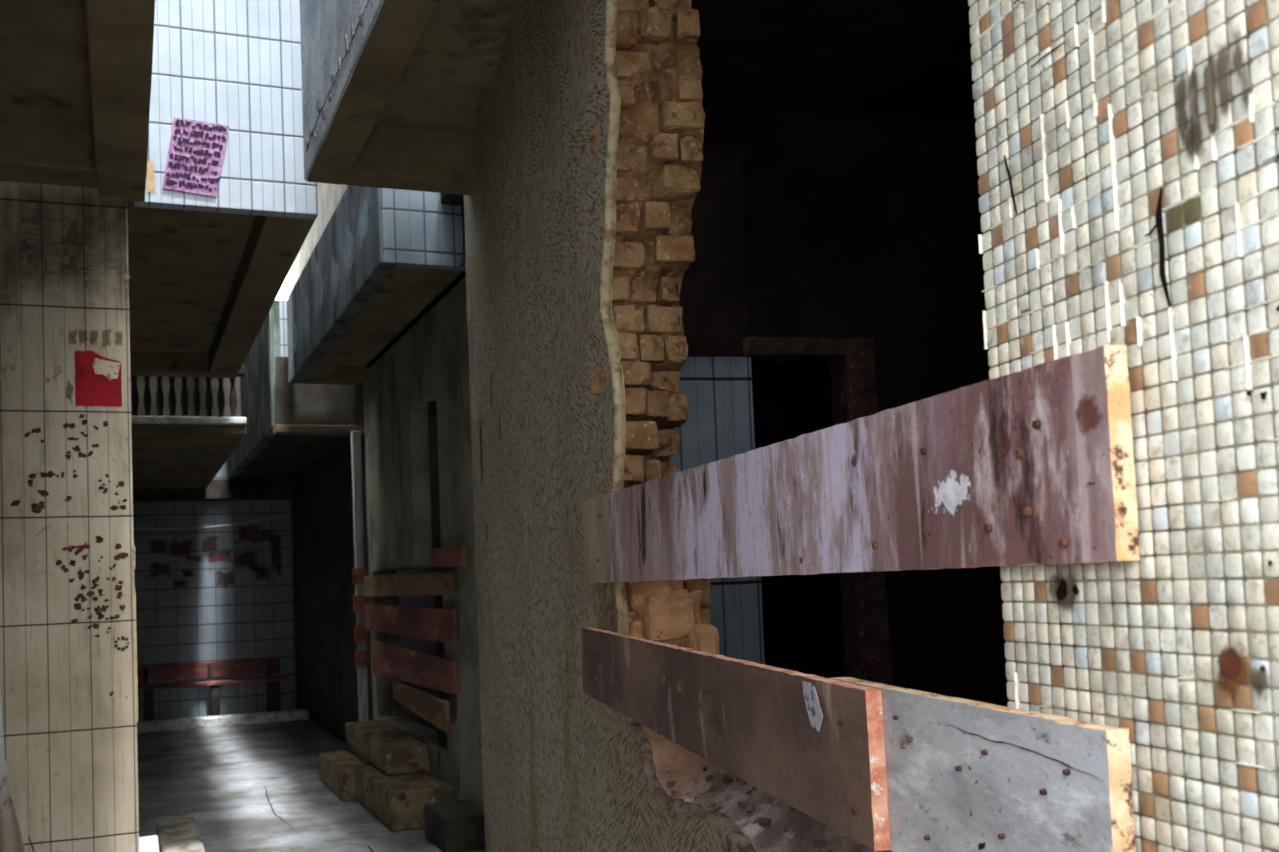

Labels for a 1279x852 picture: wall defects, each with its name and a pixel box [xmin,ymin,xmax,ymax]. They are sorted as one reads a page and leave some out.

spalling [588,0,705,492]
crack [1144,188,1171,307]
spalling [1050,573,1079,609]